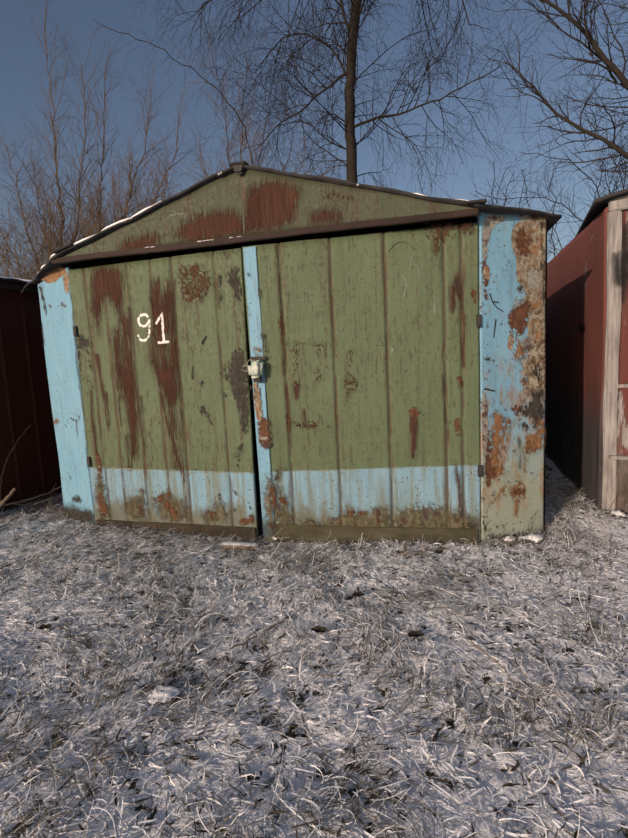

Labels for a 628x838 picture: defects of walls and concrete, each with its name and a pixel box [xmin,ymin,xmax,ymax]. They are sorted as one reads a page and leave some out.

rust [174,179,300,242]
peeling [482,214,505,286]
peeling [511,220,545,313]
rust [74,337,110,520]
rust [90,266,145,468]
rust [149,262,210,522]
rust [258,417,271,449]
rust [443,381,461,437]
peeling [481,388,495,464]
peeling [511,387,545,436]
peeling [616,391,628,463]
rust [124,488,146,519]